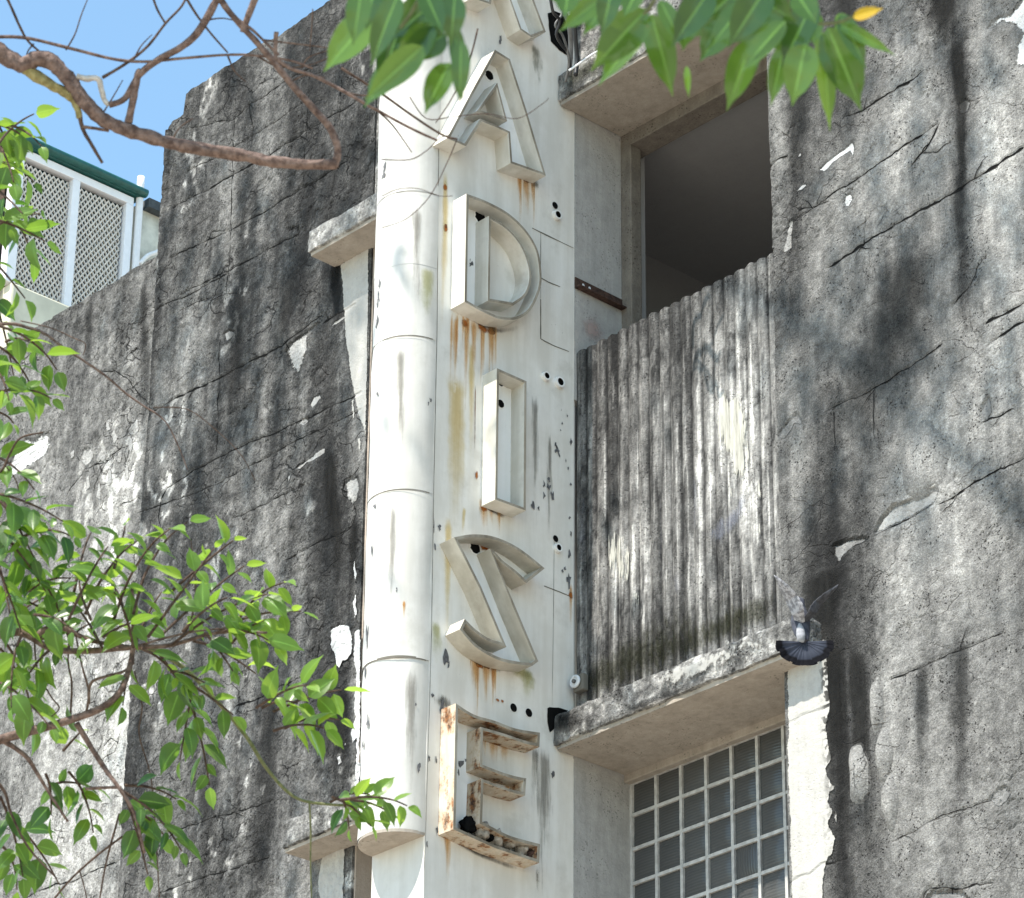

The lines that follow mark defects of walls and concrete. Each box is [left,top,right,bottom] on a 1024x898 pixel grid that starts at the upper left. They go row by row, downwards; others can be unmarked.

crack [847,71,922,116]
spalling [820,144,854,171]
crack [782,124,952,233]
crack [828,147,1024,268]
spalling [288,335,307,372]
crack [986,303,1024,340]
crack [93,311,357,527]
spalling [877,492,938,531]
crack [874,459,1023,536]
peeling [331,595,369,786]
water stain [631,637,758,709]
crack [891,628,1002,680]